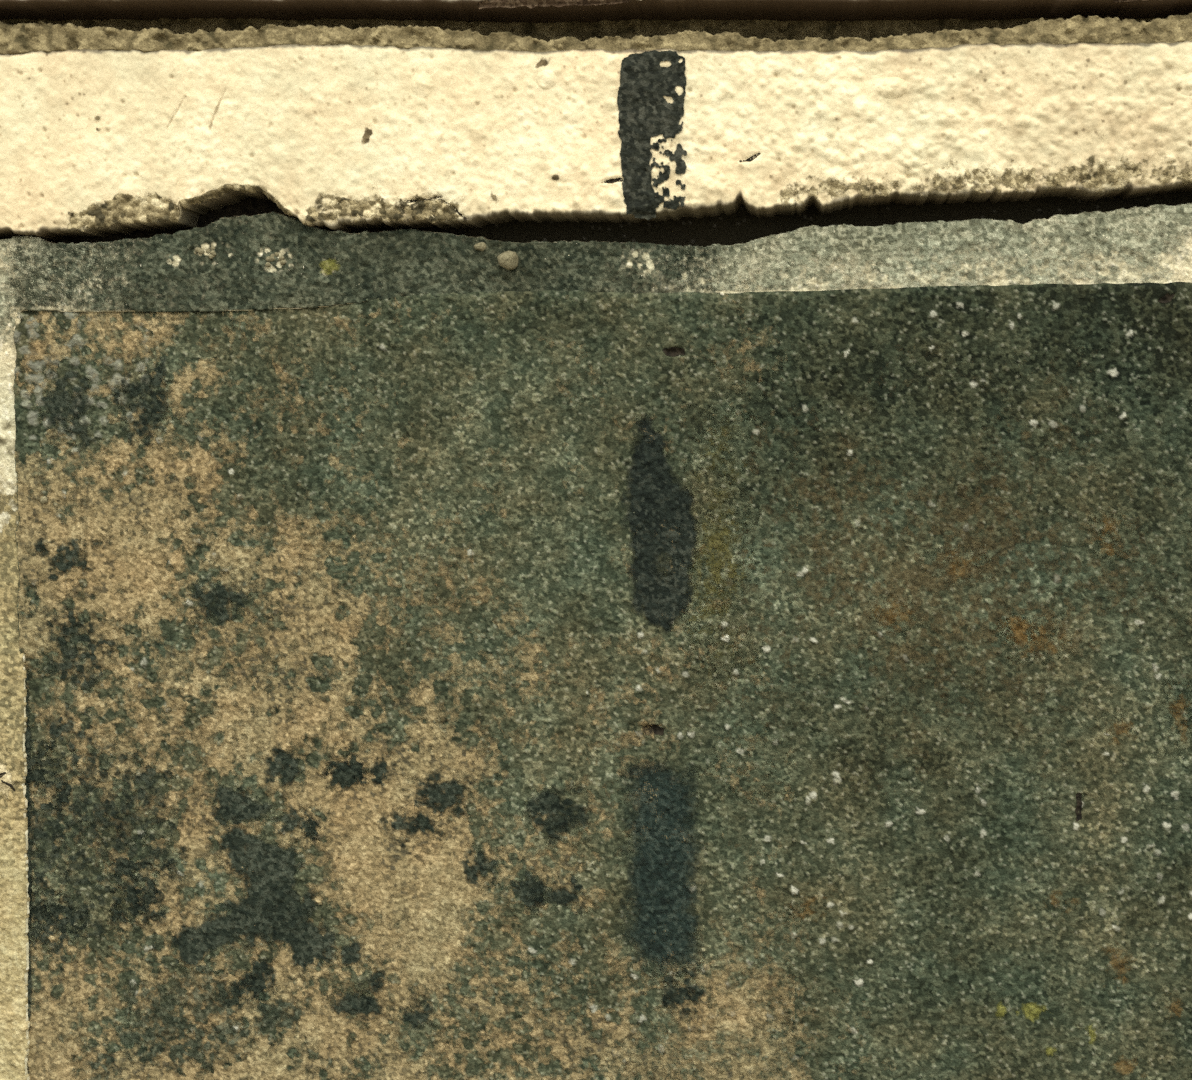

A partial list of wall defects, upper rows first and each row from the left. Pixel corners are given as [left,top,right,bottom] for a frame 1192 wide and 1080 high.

peeling [479,0,629,9]
crack [604,176,623,184]
crack [0,197,284,243]
spalling [67,184,470,232]
crack [312,195,466,234]
damp [273,364,303,433]
damp [199,420,214,437]
damp [325,454,372,482]
damp [806,477,1080,670]
damp [483,627,553,697]
damp [449,660,484,720]